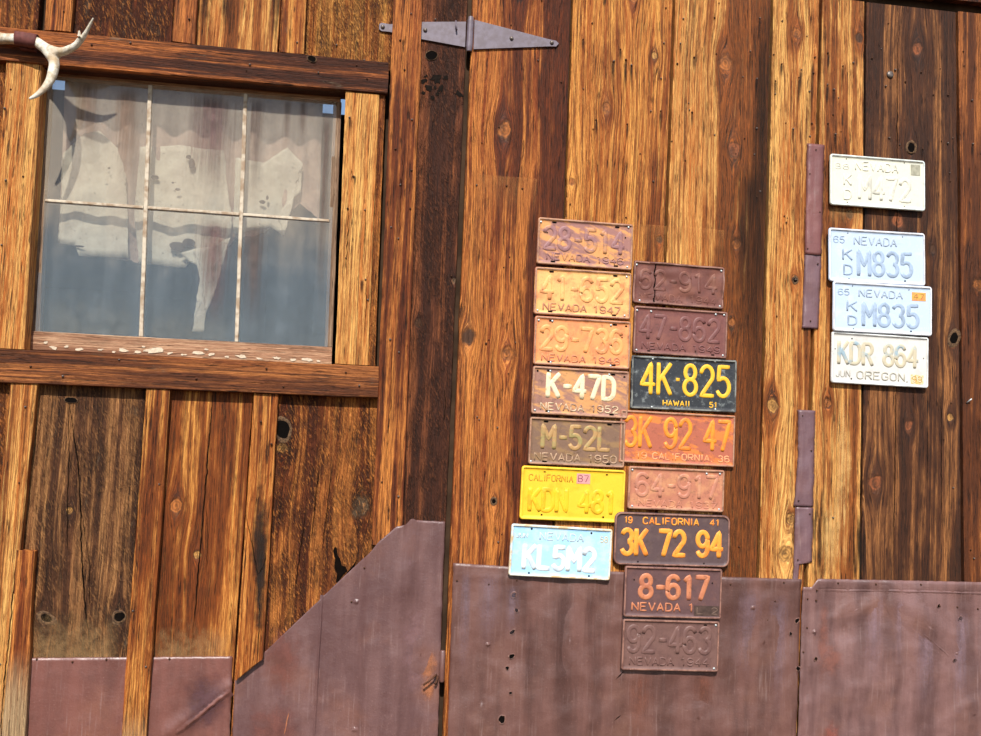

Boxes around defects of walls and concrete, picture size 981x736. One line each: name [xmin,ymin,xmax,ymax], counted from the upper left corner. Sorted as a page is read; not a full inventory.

peeling [98,346,261,359]
crack [66,406,91,652]